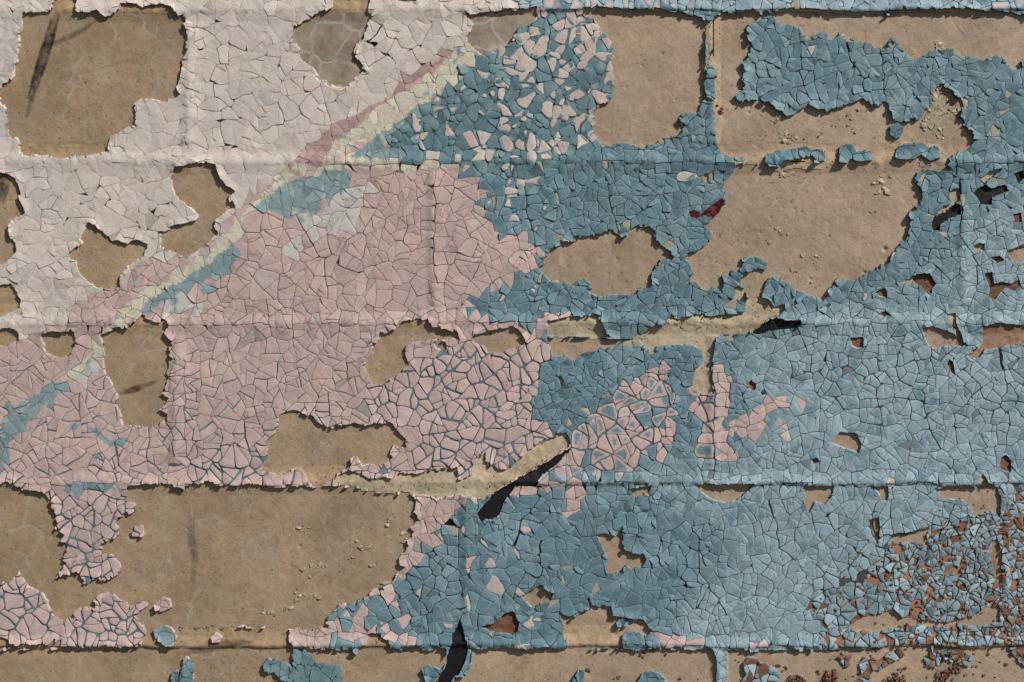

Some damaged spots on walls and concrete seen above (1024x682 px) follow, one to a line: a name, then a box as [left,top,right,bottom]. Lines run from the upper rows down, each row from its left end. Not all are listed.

peeling [828,513,838,529]
crack [826,514,929,578]
peeling [948,530,972,555]
peeling [1008,526,1024,555]
peeling [868,555,883,567]
peeling [877,554,900,582]
peeling [813,578,823,591]
peeling [824,572,870,611]
peeling [210,631,223,643]
peeling [396,613,412,630]
peeling [805,621,828,637]
peeling [816,604,840,633]